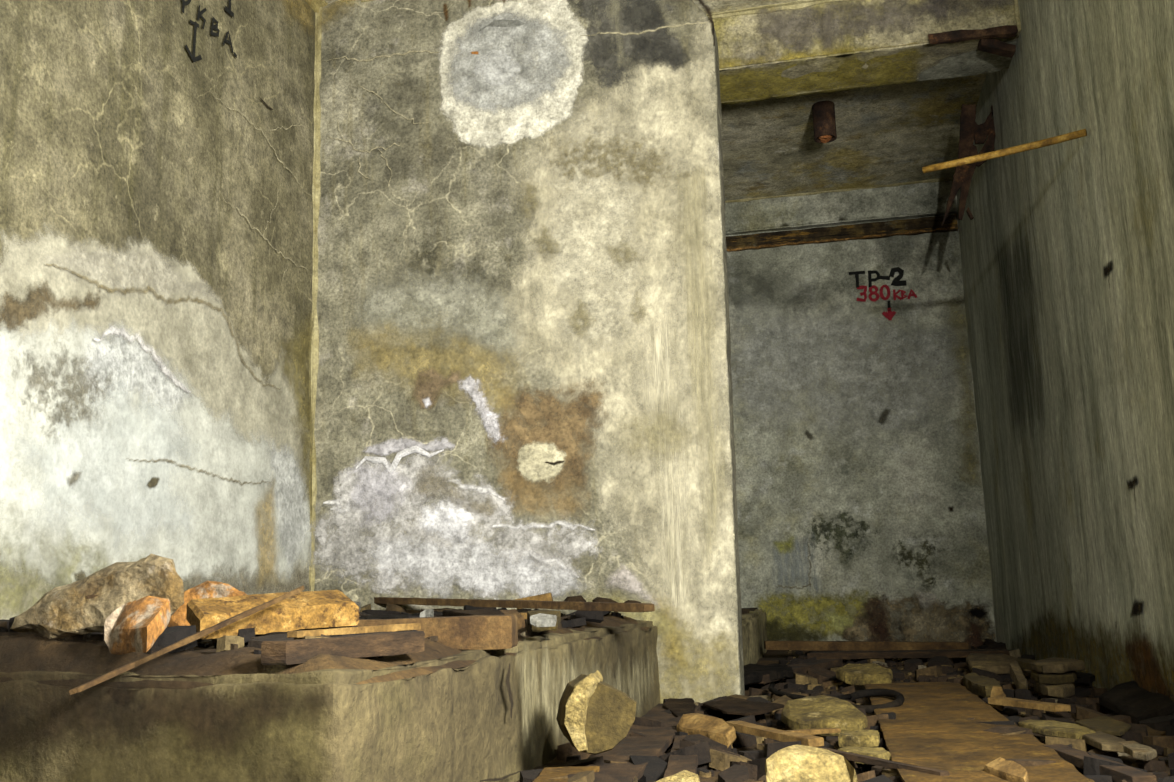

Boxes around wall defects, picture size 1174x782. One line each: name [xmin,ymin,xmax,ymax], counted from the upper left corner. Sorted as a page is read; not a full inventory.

damp [568,0,693,87]
damp [0,229,598,757]
rust [360,335,602,509]